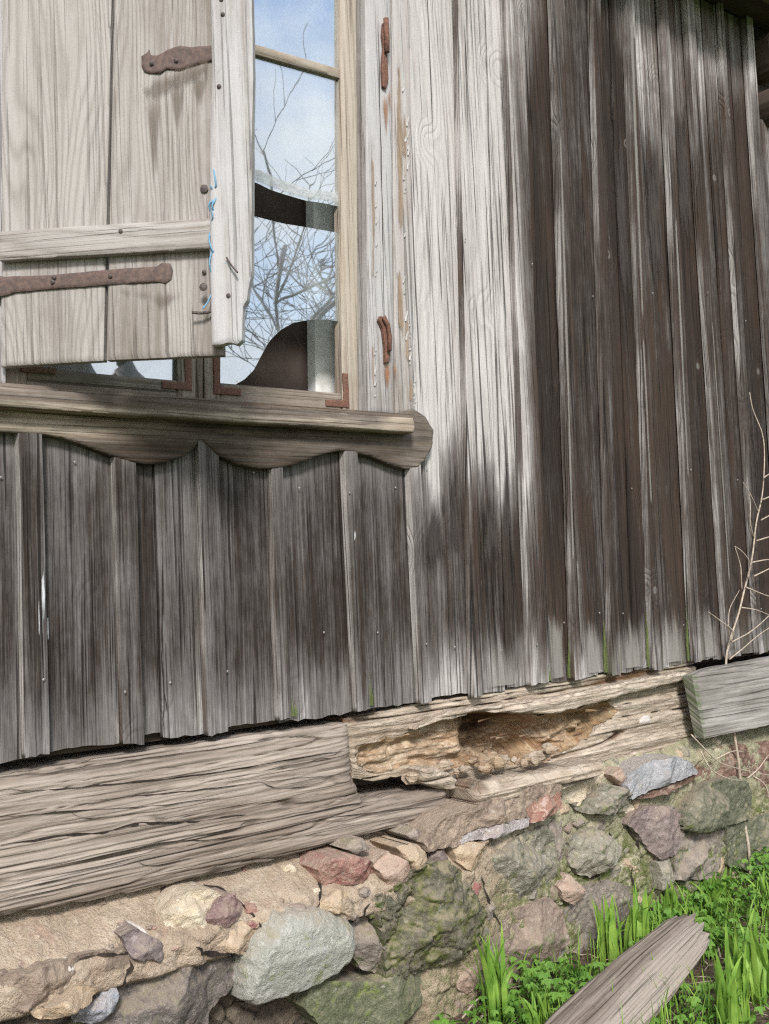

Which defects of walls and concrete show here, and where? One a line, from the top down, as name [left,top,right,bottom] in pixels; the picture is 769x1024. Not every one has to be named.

leakage [560,139,569,407]
leakage [481,461,512,564]
leakage [548,628,570,681]
leakage [588,617,650,673]
crack [1,750,439,895]
crack [204,884,262,927]
crack [315,882,323,908]